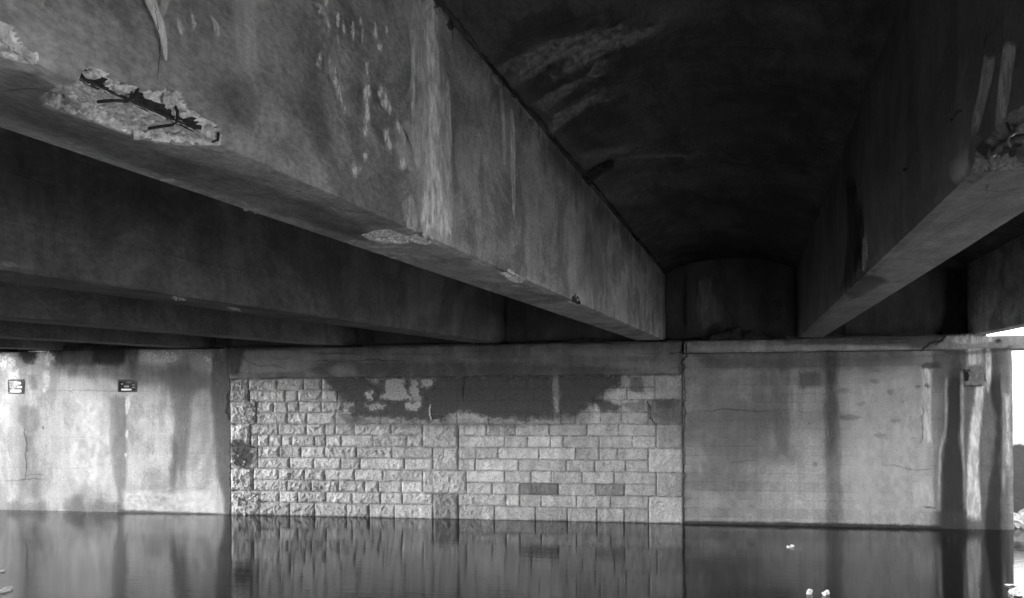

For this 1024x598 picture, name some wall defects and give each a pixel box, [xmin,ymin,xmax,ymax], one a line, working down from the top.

spalling [0,21,39,65]
spalling [42,66,223,146]
spalling [971,107,1024,173]
spalling [361,229,434,245]
damp [67,349,388,518]
crack [670,341,688,522]
damp [659,268,1009,530]